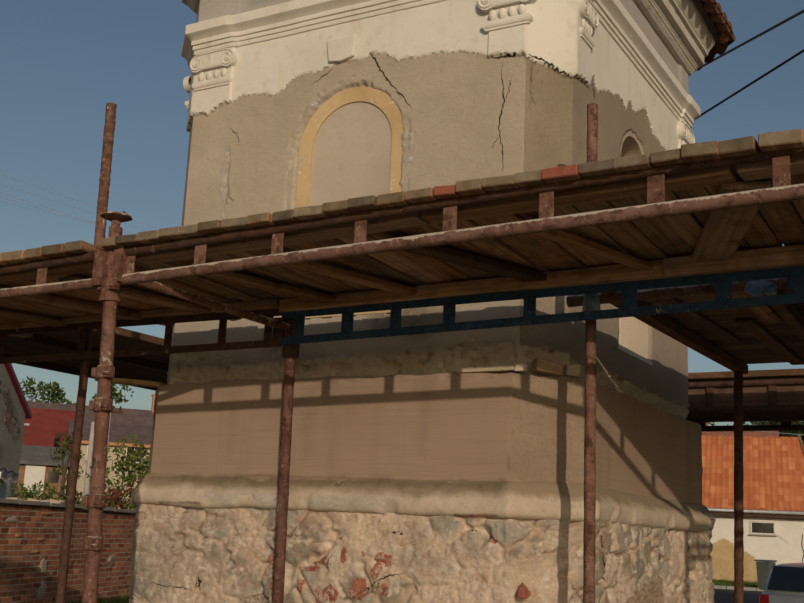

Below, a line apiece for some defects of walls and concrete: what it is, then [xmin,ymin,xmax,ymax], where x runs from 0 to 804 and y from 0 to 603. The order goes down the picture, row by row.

crack [370,52,412,108]
peeling [181,50,666,226]
crack [491,52,575,171]
spalling [167,318,285,385]
peeling [295,296,585,379]
peeling [596,303,690,419]